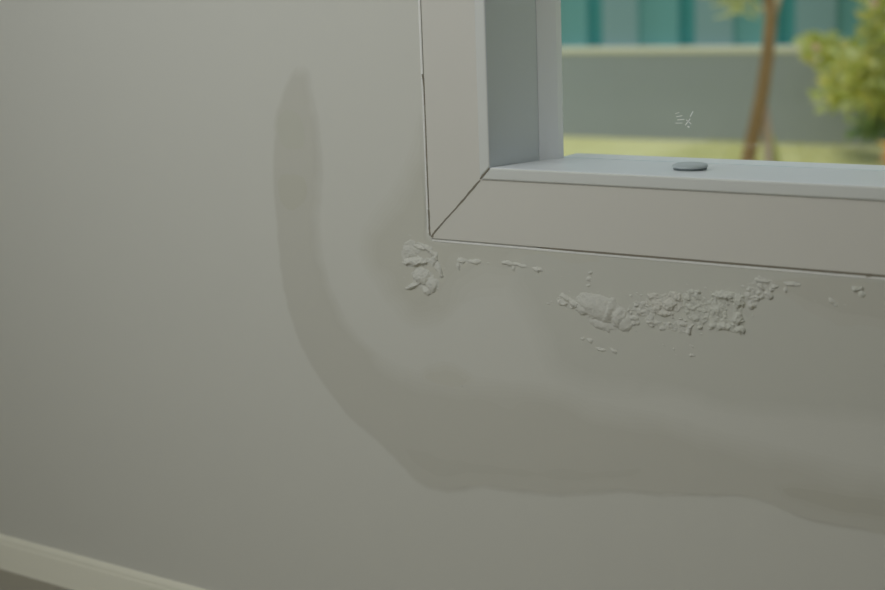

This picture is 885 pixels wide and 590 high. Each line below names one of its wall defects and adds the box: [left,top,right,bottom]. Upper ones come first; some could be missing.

leakage [272,66,885,536]